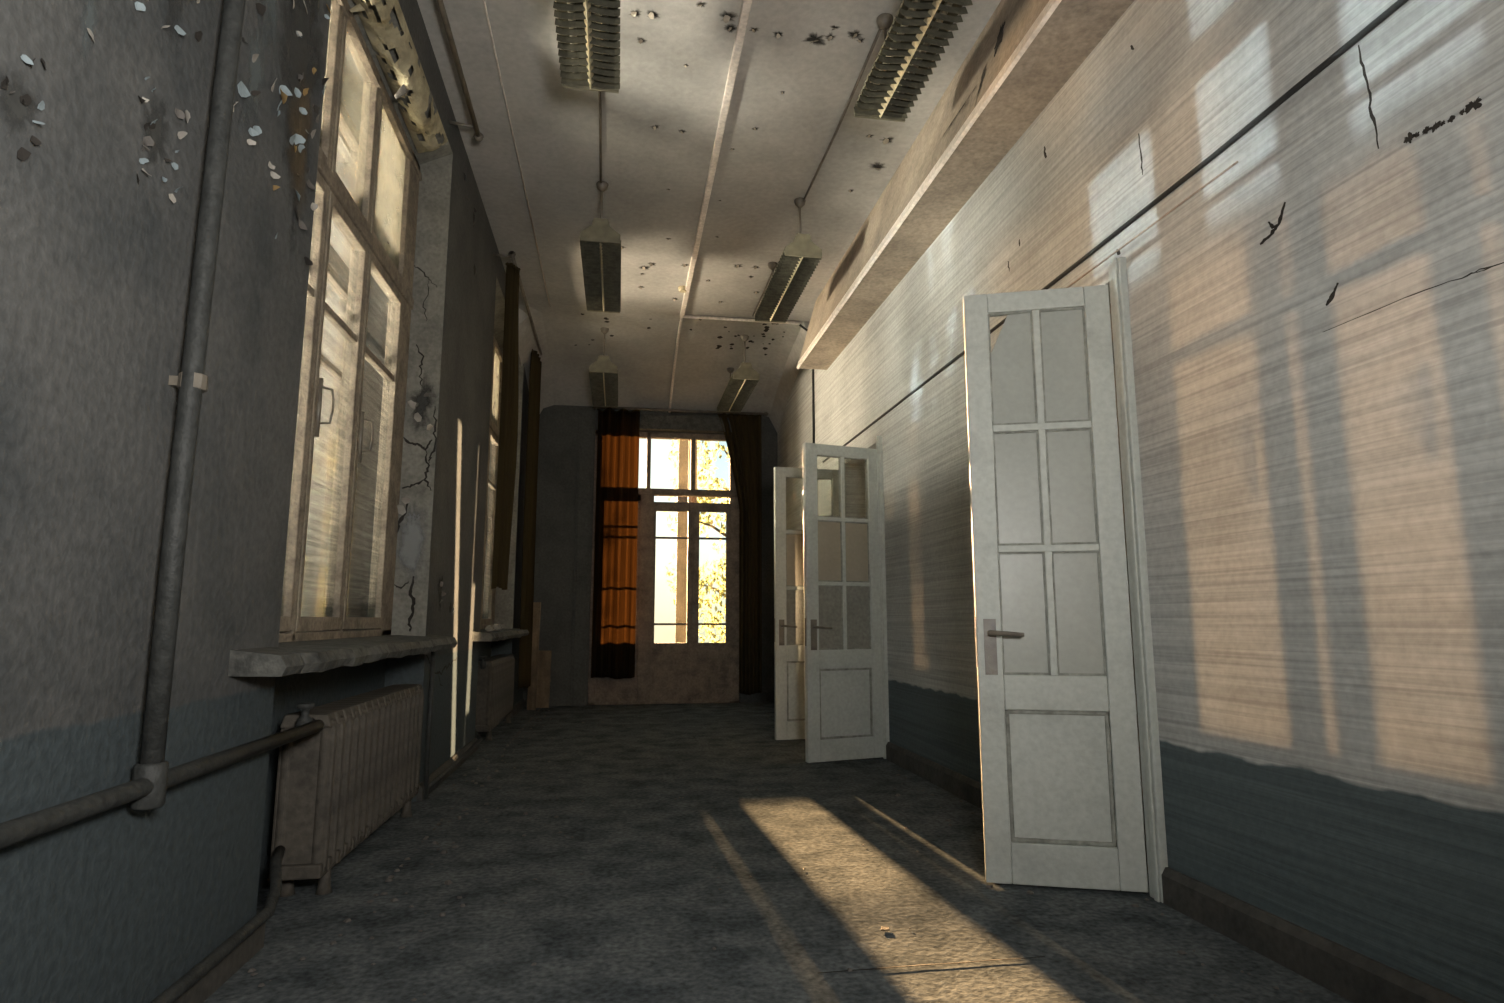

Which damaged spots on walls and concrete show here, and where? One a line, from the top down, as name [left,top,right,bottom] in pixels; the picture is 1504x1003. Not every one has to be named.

peeling [631,10,658,19]
peeling [721,12,757,33]
peeling [806,26,864,45]
crack [1358,45,1379,149]